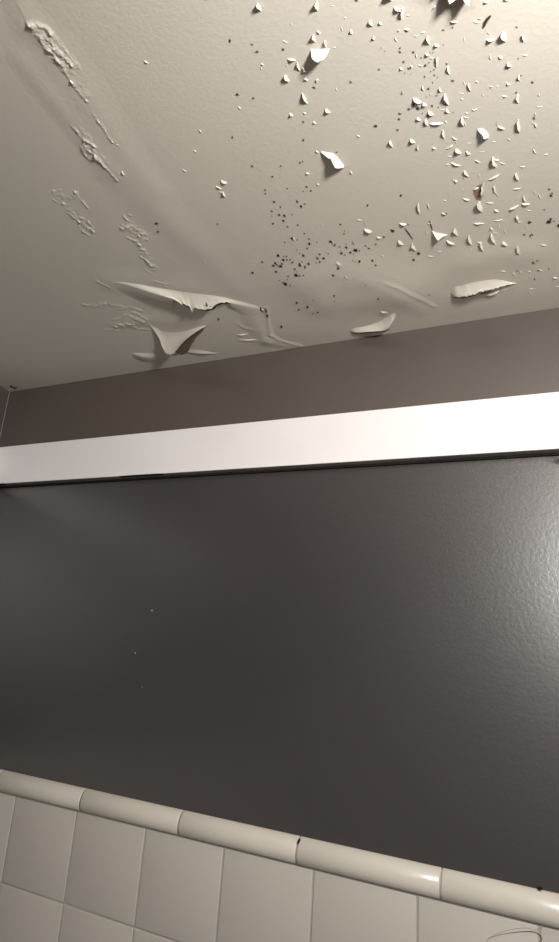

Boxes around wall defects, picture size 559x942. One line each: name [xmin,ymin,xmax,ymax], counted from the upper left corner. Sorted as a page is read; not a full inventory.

peeling [310,31,336,62]
peeling [391,0,450,75]
peeling [473,15,507,42]
peeling [316,150,352,174]
peeling [357,85,547,261]
damp [261,186,394,286]
peeling [451,263,542,298]
peeling [114,282,265,316]
peeling [350,311,396,334]
peeling [131,324,215,363]